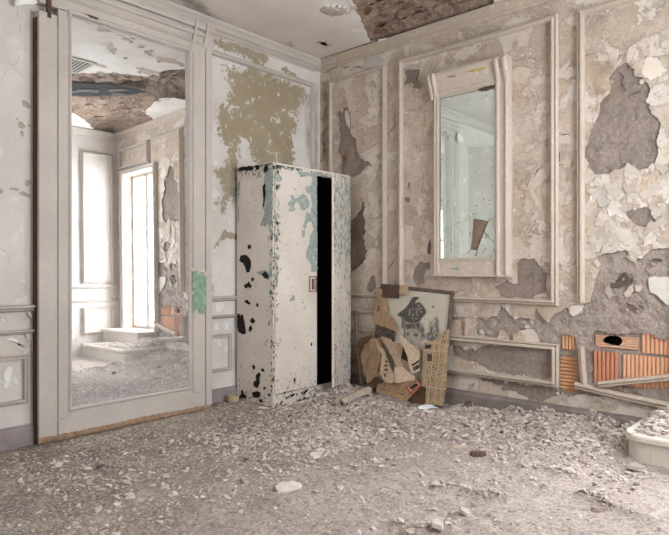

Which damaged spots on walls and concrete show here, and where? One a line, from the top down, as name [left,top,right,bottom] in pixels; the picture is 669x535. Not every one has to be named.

spalling [404,68,422,90]
peeling [212,37,308,215]
spalling [335,107,382,182]
spalling [351,202,375,279]
spalling [452,49,669,402]
peeling [191,268,224,315]